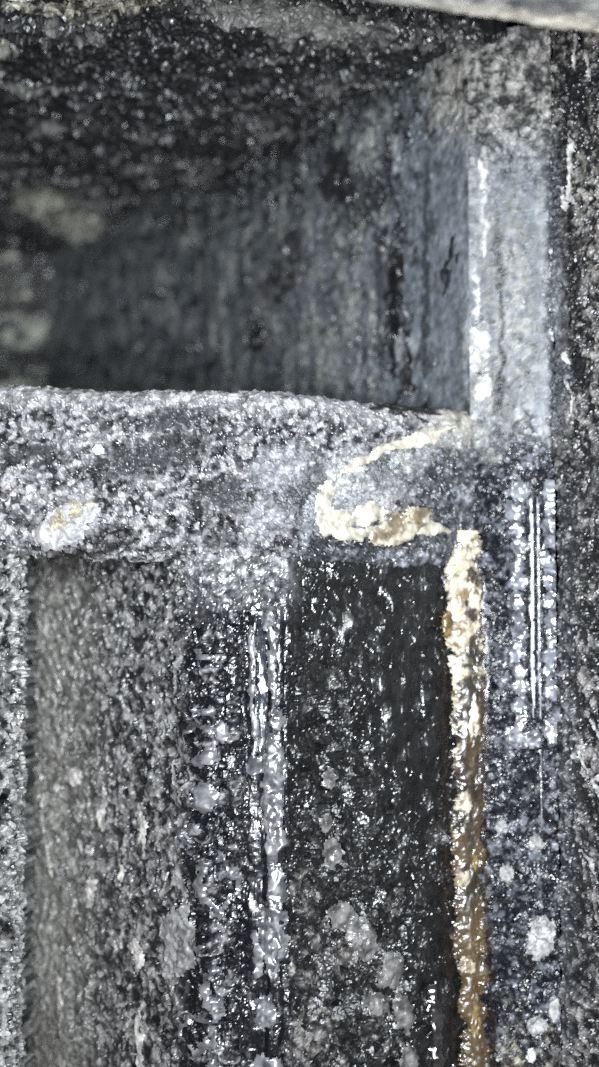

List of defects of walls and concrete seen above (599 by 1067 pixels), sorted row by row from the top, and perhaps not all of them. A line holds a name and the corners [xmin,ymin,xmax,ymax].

corrosion [437,530,497,1067]